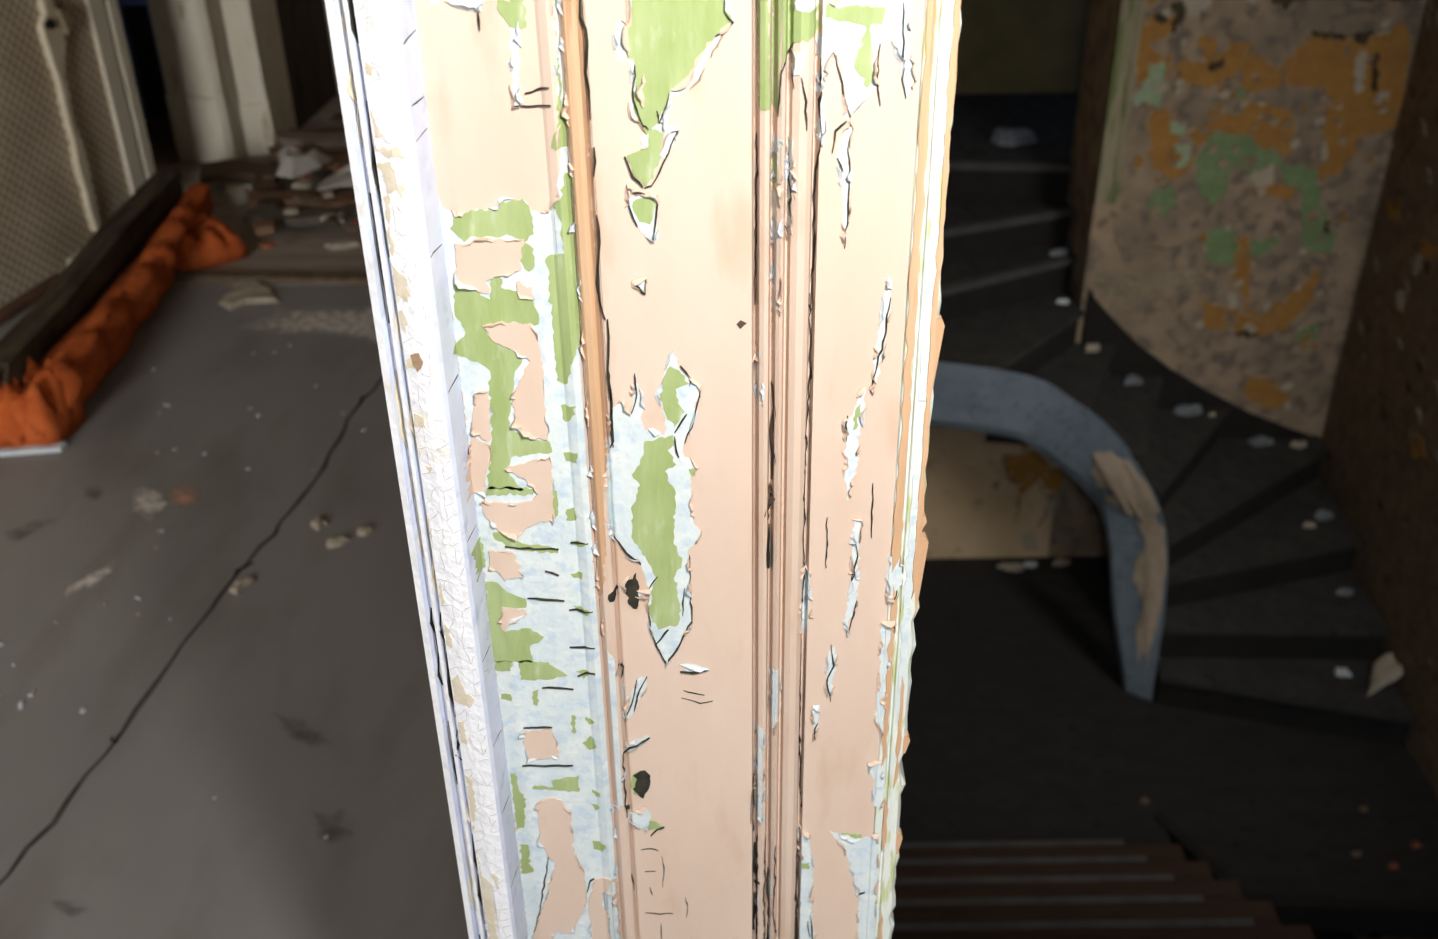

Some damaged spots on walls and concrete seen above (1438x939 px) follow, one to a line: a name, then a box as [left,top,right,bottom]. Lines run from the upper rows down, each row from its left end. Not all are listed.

peeling [371,109,410,334]
peeling [429,0,710,939]
peeling [612,0,735,244]
peeling [752,0,961,939]
peeling [992,445,1063,551]
peeling [1091,450,1167,670]
peeling [1196,246,1328,352]
peeling [1235,372,1293,414]
peeling [1132,0,1412,212]